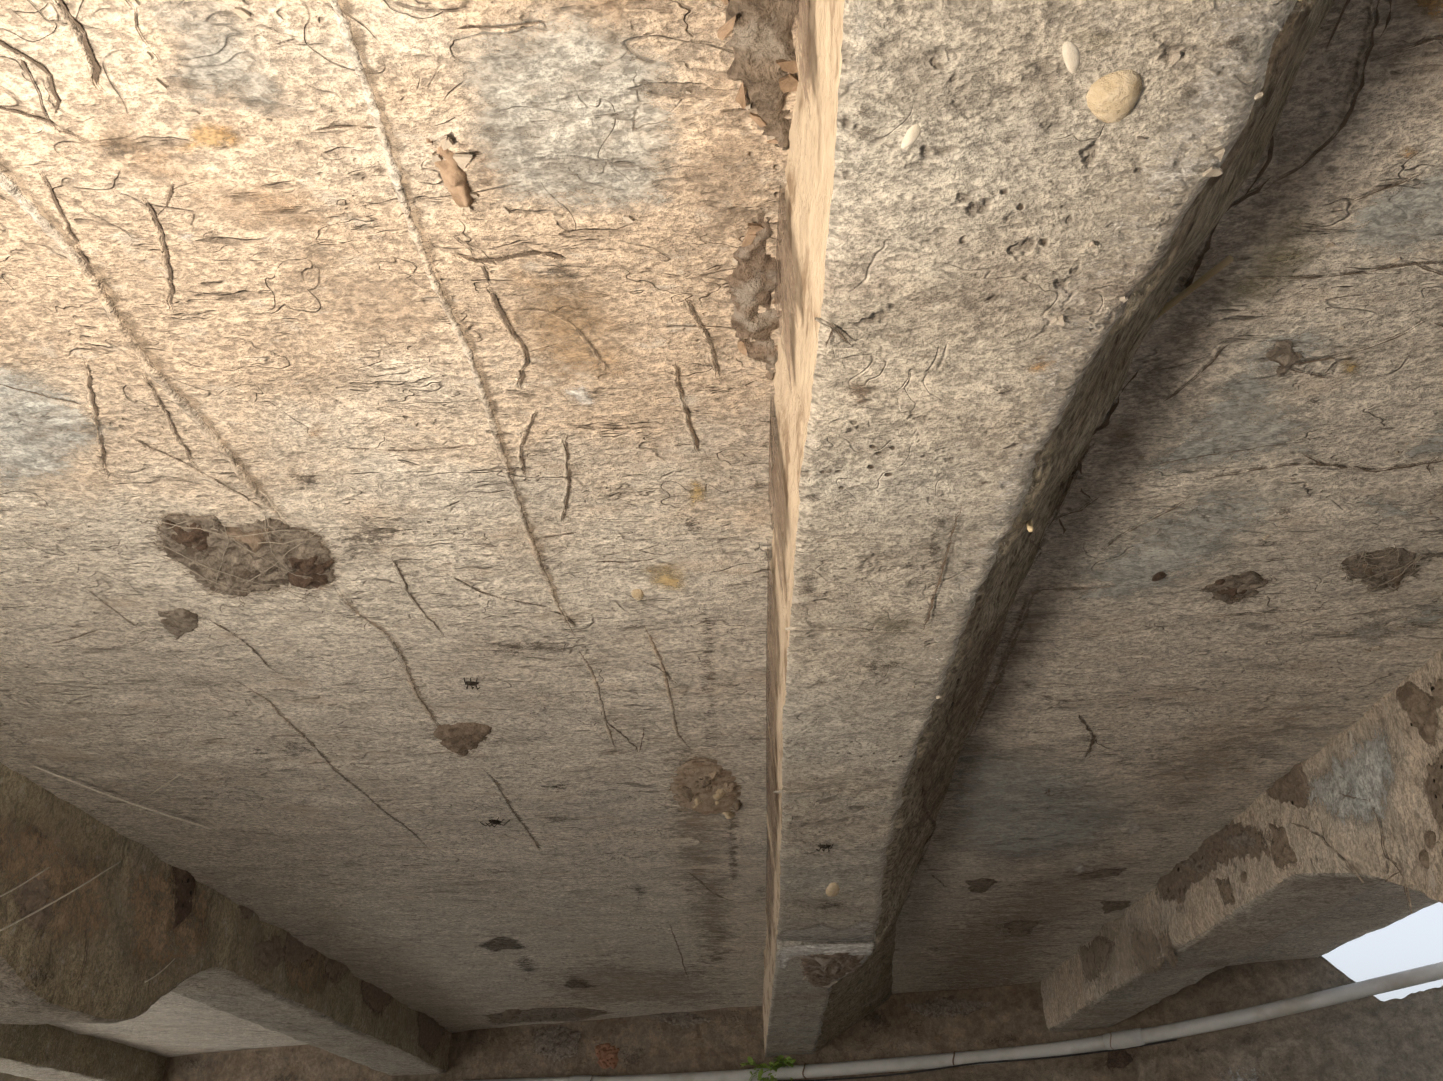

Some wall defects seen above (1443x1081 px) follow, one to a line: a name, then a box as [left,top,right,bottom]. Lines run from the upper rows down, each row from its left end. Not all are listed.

crack [0,41,88,144]
crack [52,0,103,92]
crack [457,21,548,34]
spalling [717,0,799,151]
crack [1172,0,1443,297]
crack [0,170,95,277]
crack [135,185,174,313]
spalling [724,213,781,381]
crack [0,357,268,512]
crack [451,236,721,539]
crack [1099,436,1443,553]
spalling [776,920,874,988]